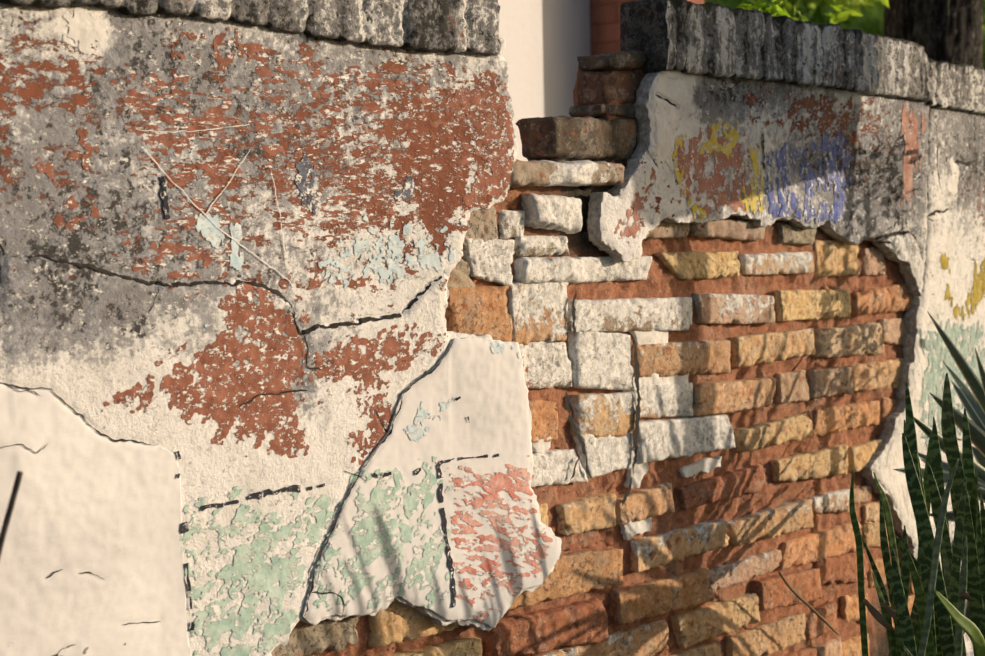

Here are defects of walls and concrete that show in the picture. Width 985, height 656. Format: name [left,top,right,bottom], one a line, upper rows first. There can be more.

peeling [61,8,107,55]
peeling [31,127,99,188]
peeling [947,157,959,201]
peeling [53,195,101,232]
crack [0,244,442,407]
flaking render [102,22,915,656]
crack [570,290,578,337]
peeling [910,252,985,460]
crack [0,383,155,446]
crack [565,389,593,481]
crack [622,336,641,506]